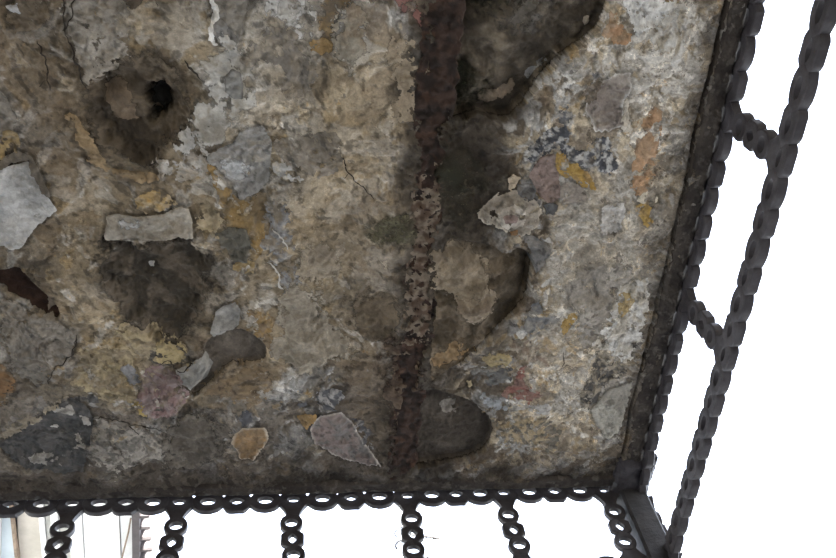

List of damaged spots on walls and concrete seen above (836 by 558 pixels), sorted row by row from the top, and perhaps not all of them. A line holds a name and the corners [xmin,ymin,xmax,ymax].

crack [37,42,51,89]
crack [62,0,88,87]
peeling [0,130,21,160]
peeling [64,112,178,214]
peeling [195,125,304,294]
crack [343,158,374,199]
leakage [543,203,558,215]
spalling [0,235,278,482]
corrosion [373,335,426,455]